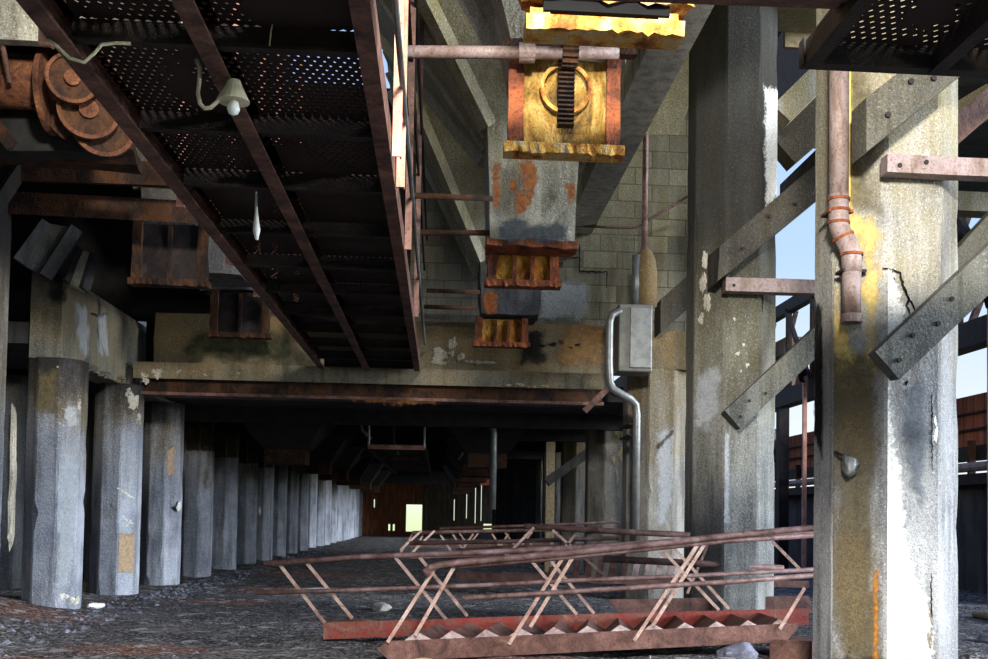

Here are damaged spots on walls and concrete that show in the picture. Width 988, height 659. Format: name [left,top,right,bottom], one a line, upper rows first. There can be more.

water stain [851,72,870,132]
rust [492,160,538,214]
crack [882,267,915,316]
water stain [520,330,547,365]
water stain [814,149,934,659]